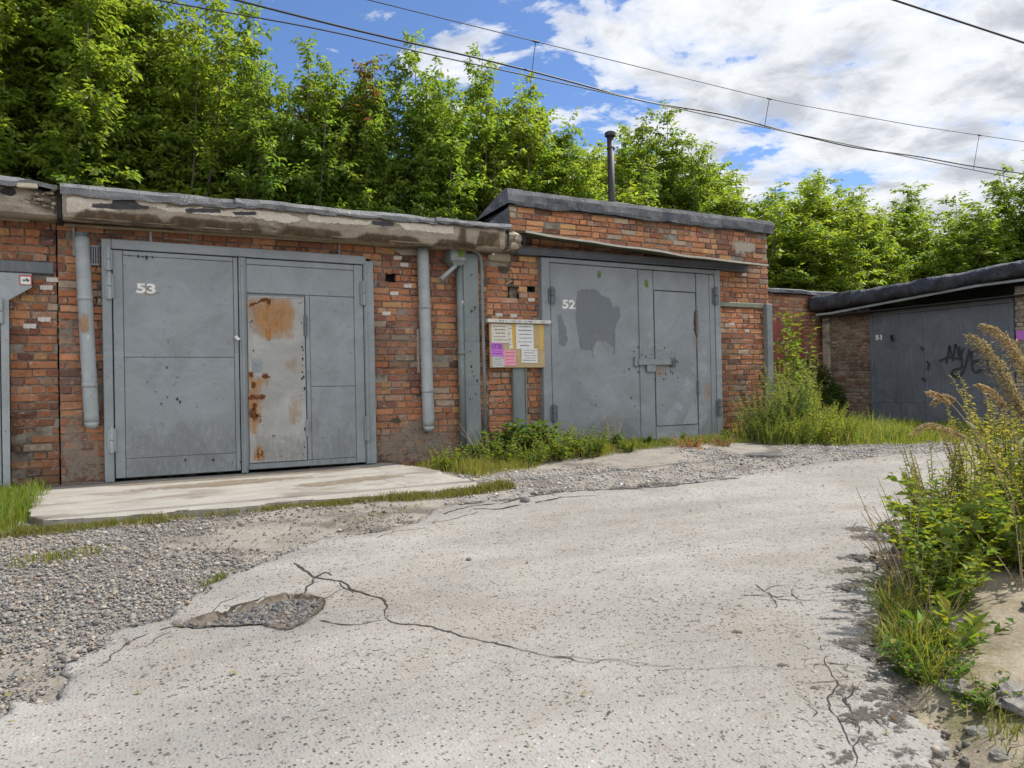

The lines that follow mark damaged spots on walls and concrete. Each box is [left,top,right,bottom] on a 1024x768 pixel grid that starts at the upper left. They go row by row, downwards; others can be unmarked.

leakage [74,209,261,234]
leakage [279,226,342,240]
leakage [356,233,420,255]
rust [249,298,292,340]
rust [248,372,270,429]
crack [293,562,388,618]
crack [657,656,853,746]